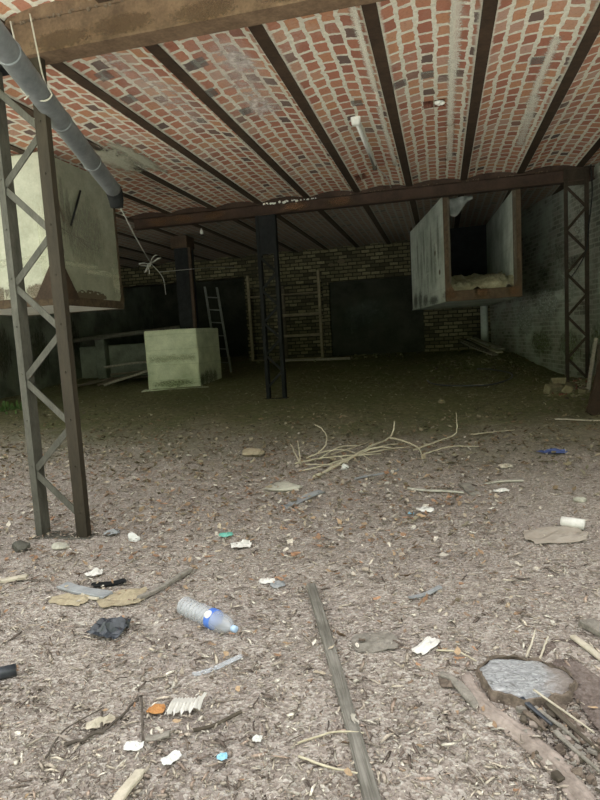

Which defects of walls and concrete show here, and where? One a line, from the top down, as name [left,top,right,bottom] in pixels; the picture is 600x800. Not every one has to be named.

leakage [445,0,464,161]